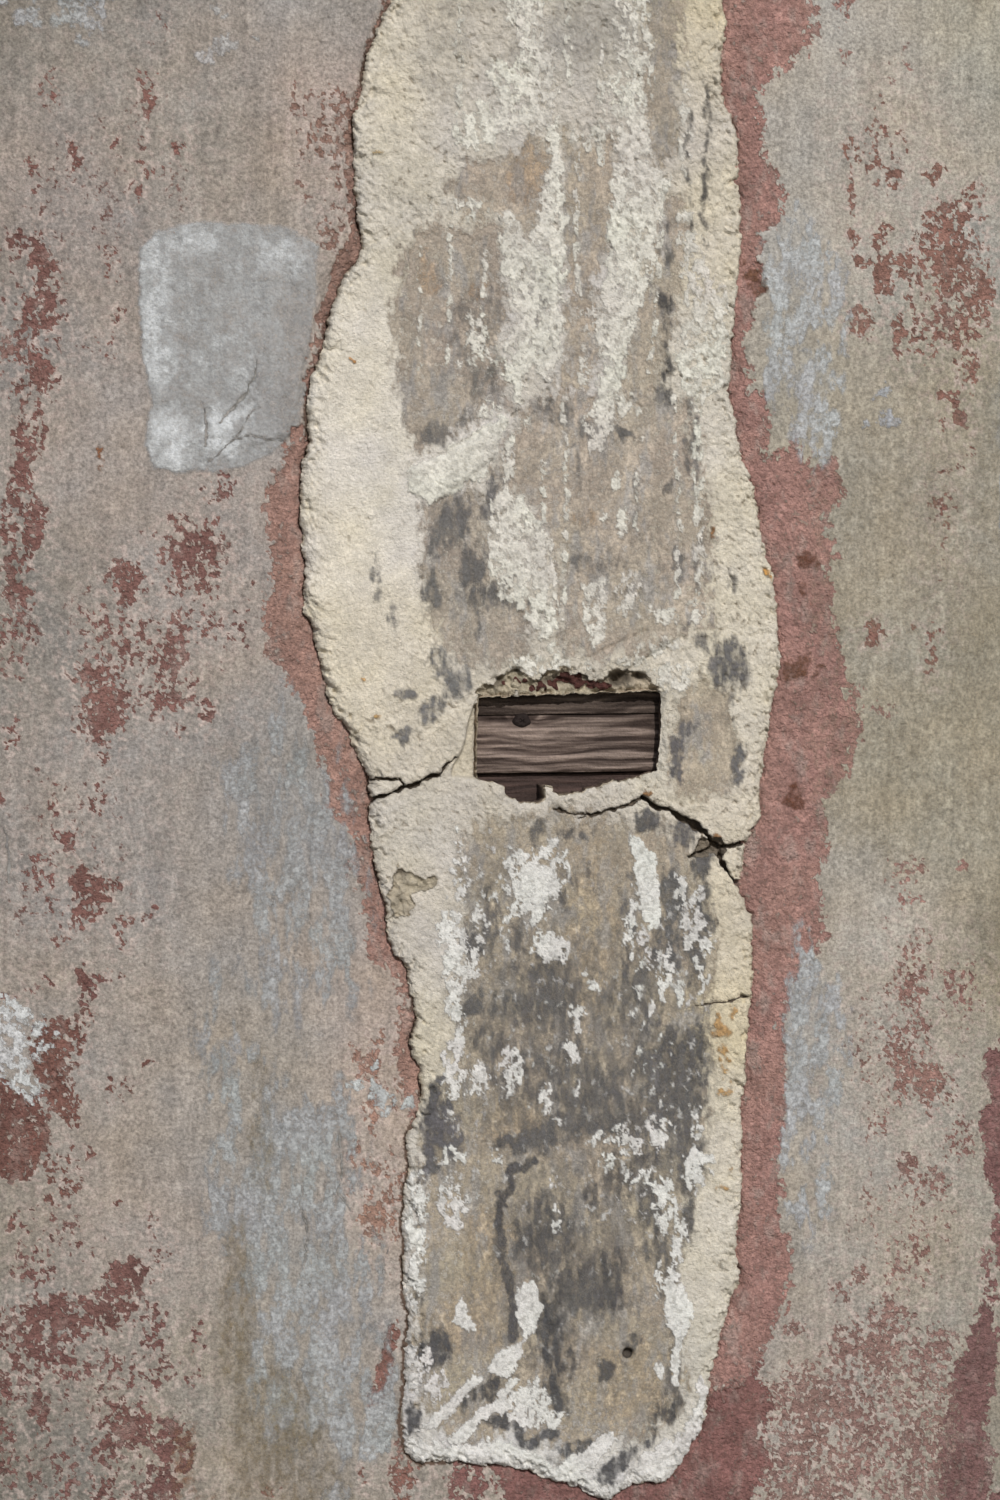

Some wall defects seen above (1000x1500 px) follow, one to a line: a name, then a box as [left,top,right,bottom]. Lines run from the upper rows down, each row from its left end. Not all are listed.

peeling [442,0,1000,1500]
crack [553,795,743,885]
peeling [367,1319,401,1408]
peeling [387,1438,420,1500]